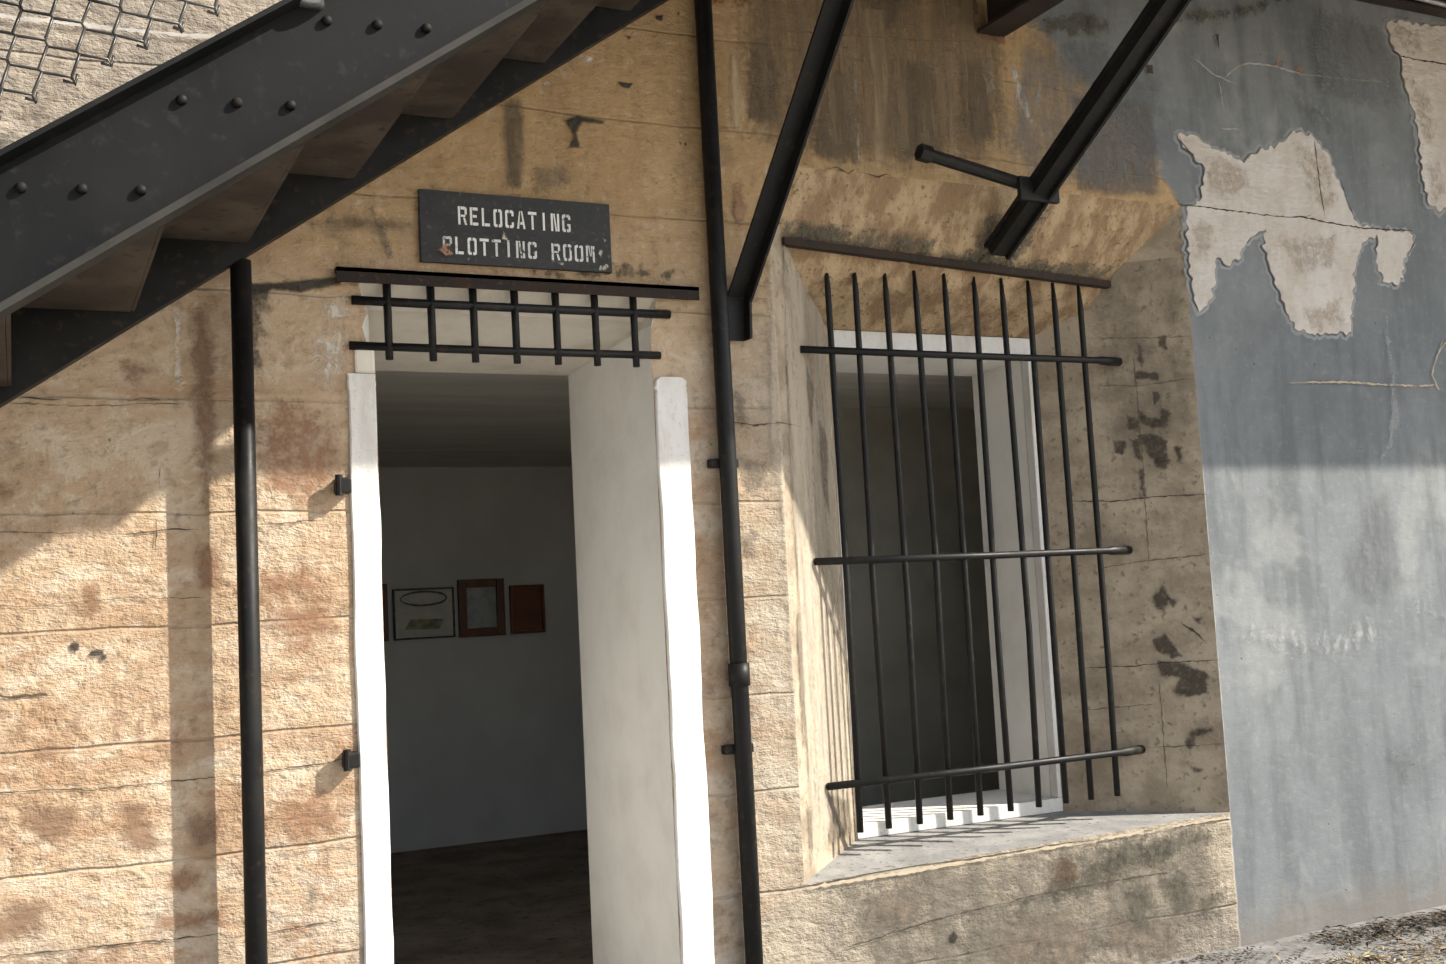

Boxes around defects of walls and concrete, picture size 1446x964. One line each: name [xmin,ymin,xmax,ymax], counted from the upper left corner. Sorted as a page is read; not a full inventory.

peeling [1382,16,1446,218]
peeling [1173,127,1416,341]
crack [1291,339,1446,390]